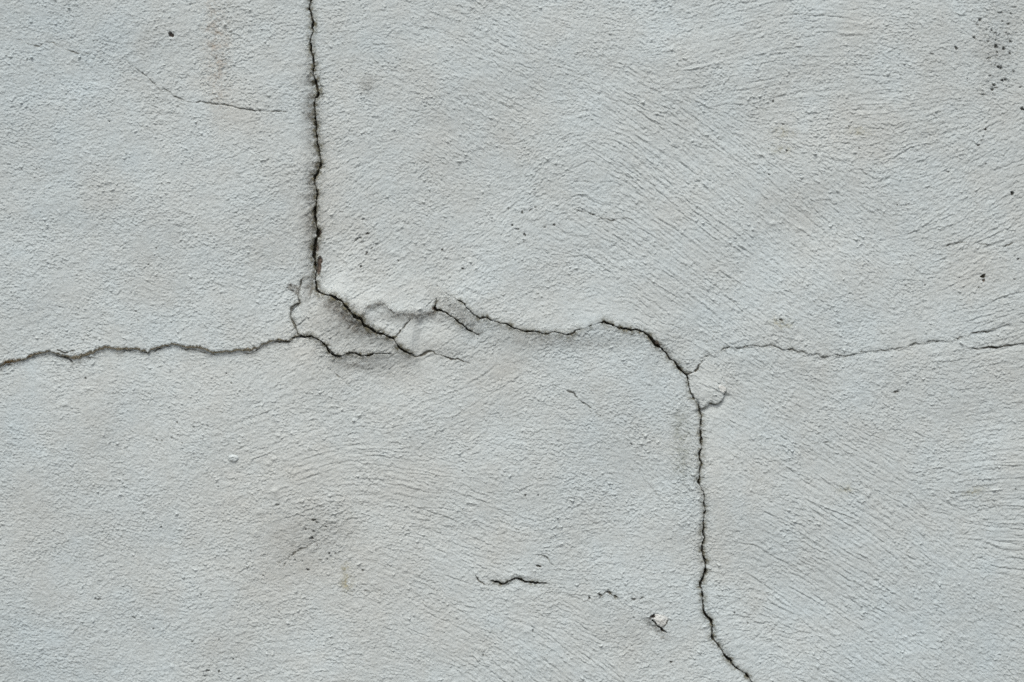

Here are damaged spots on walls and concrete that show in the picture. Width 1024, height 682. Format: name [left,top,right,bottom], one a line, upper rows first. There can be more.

crack [290,0,749,679]
crack [973,331,1023,350]